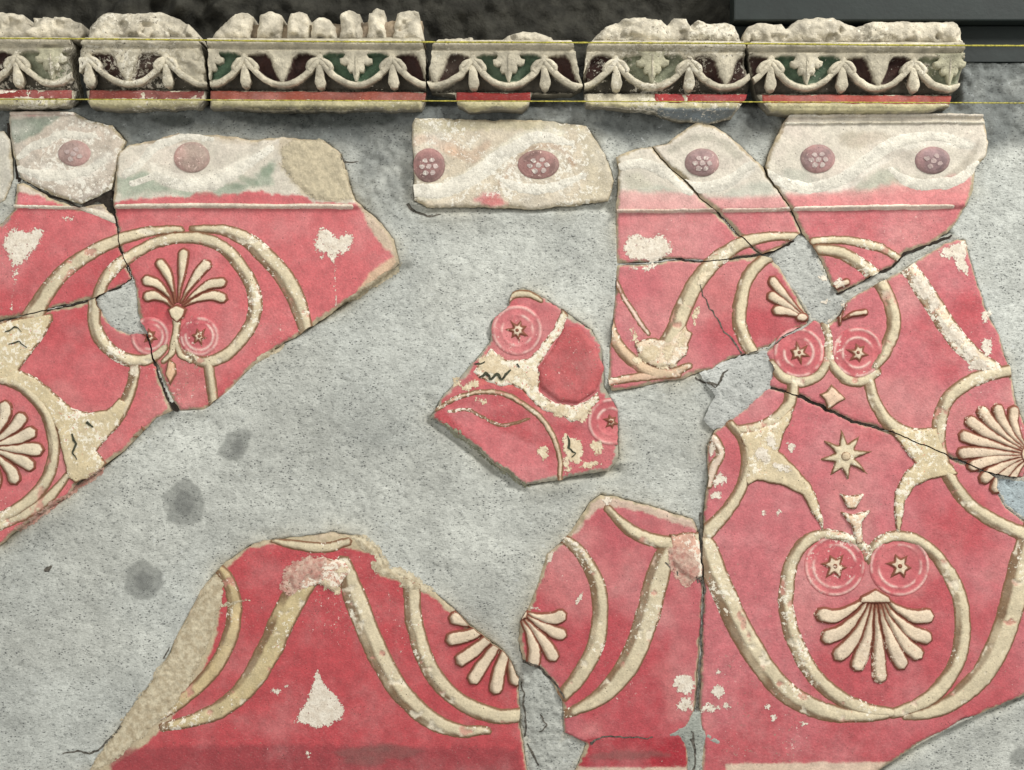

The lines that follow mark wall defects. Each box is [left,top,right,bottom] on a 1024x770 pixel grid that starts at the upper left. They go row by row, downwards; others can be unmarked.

crack [0,123,132,348]
crack [836,235,952,295]
crack [147,332,179,412]
crack [71,421,93,460]
crack [770,387,1014,477]
spalling [279,555,349,596]
spalling [668,545,700,588]
crack [665,512,706,770]